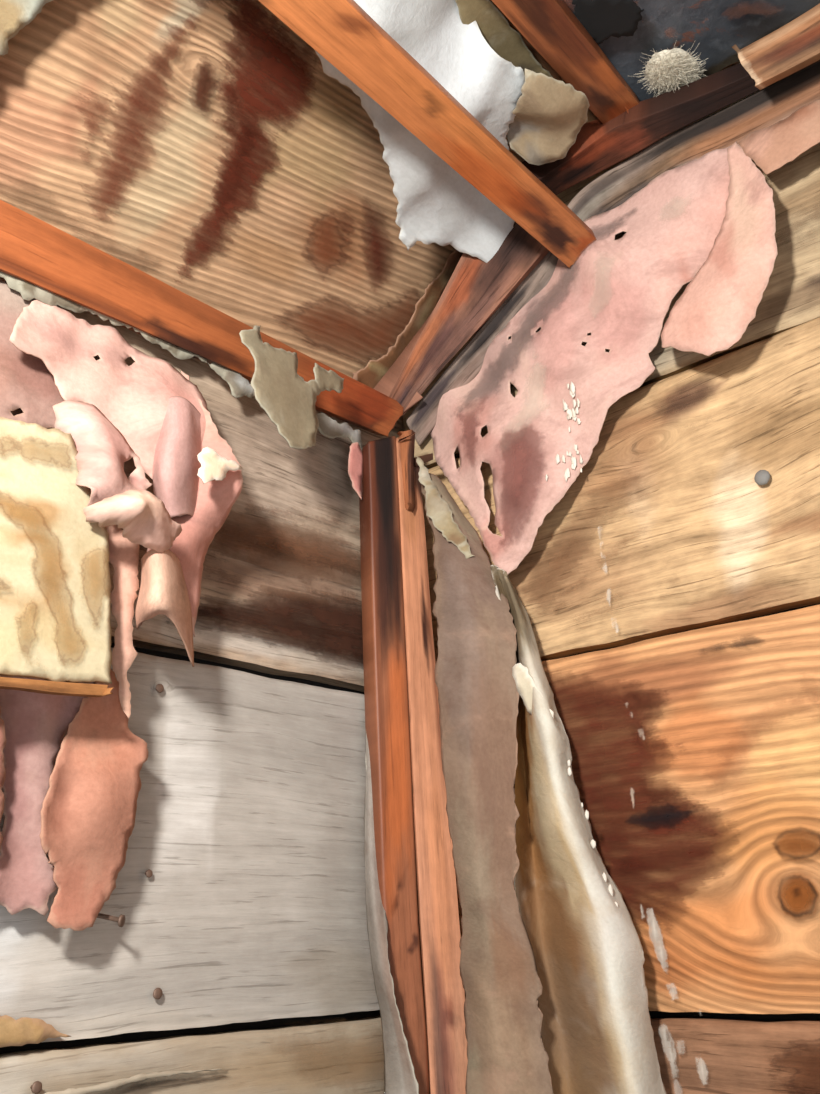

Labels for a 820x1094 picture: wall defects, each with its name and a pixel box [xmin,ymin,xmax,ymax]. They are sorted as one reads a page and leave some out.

damp [98,48,171,204]
damp [181,0,312,274]
damp [366,216,386,281]
damp [287,290,417,358]
peeling [555,381,583,482]
damp [549,680,723,917]
crack [86,1073,218,1094]